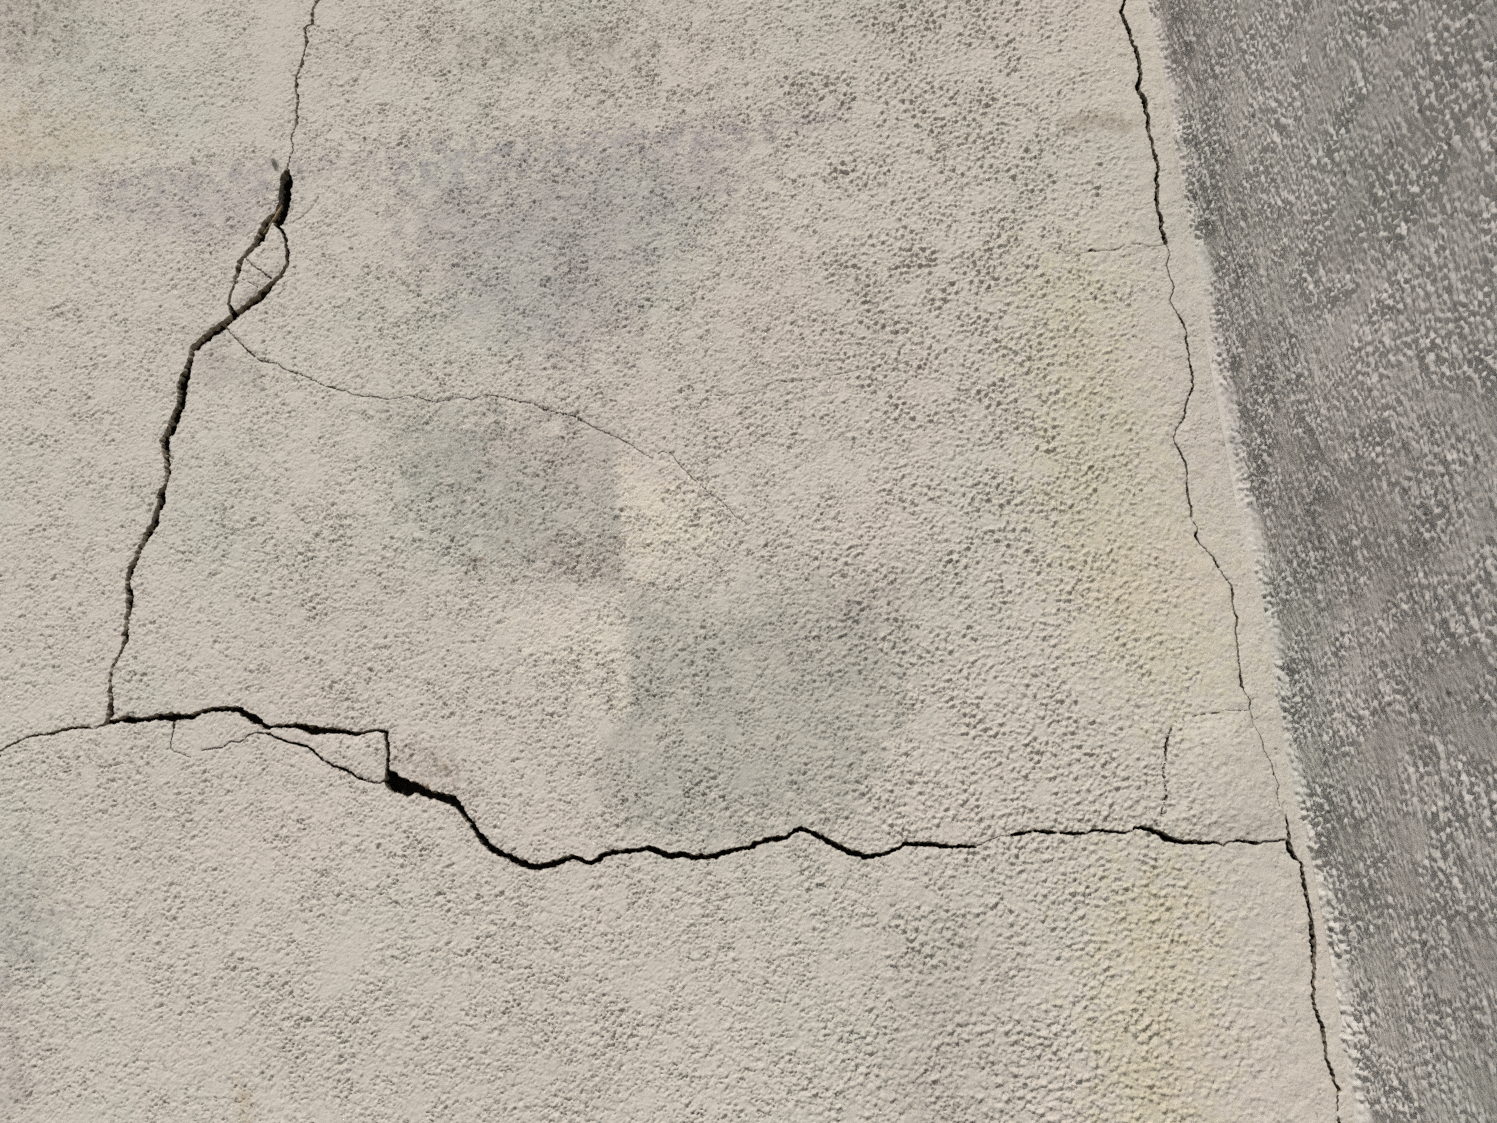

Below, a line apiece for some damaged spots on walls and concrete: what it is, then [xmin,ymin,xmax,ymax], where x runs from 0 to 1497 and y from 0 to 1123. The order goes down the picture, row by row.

crack [286,0,320,178]
crack [0,196,747,784]
crack [419,0,1342,1123]